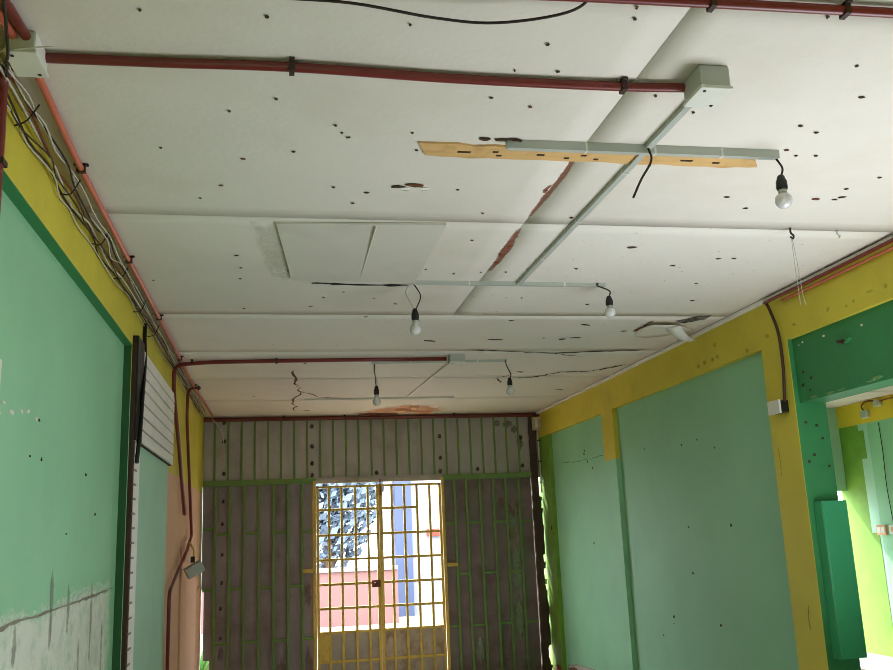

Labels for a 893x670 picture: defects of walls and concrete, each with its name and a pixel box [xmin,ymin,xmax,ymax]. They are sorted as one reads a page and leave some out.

crack [291,370,329,411]